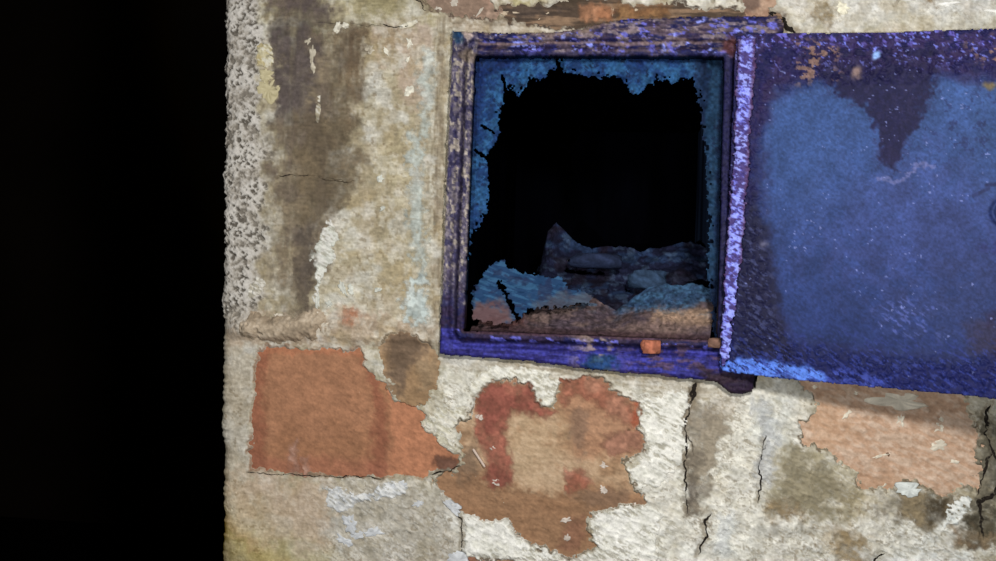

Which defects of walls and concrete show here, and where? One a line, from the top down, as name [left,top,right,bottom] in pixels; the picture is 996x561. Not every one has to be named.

flaking render [426,0,783,30]
damp [264,0,369,313]
flaking render [248,331,691,561]
crack [683,383,711,554]
flaking render [799,380,984,531]
crack [976,405,996,536]